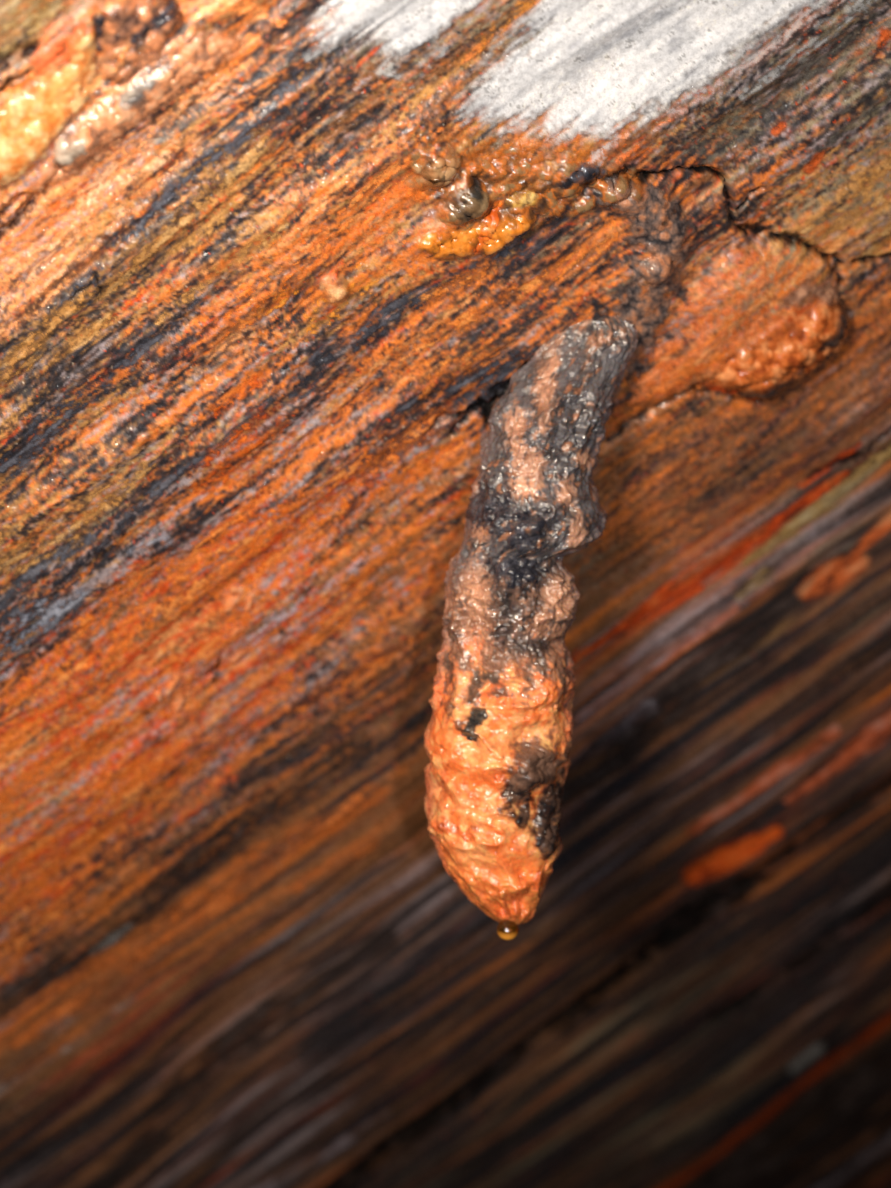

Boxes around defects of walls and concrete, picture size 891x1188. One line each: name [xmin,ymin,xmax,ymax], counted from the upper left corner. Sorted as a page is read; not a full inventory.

rust [185,0,287,58]
damp [458,0,891,165]
rust [658,0,842,126]
rust [0,76,226,334]
damp [0,0,481,393]
rust [222,163,491,339]
rust [398,231,619,361]
crack [587,166,891,313]
rust [0,407,445,720]
rust [799,512,891,599]
rust [688,711,891,832]
rust [684,826,783,884]